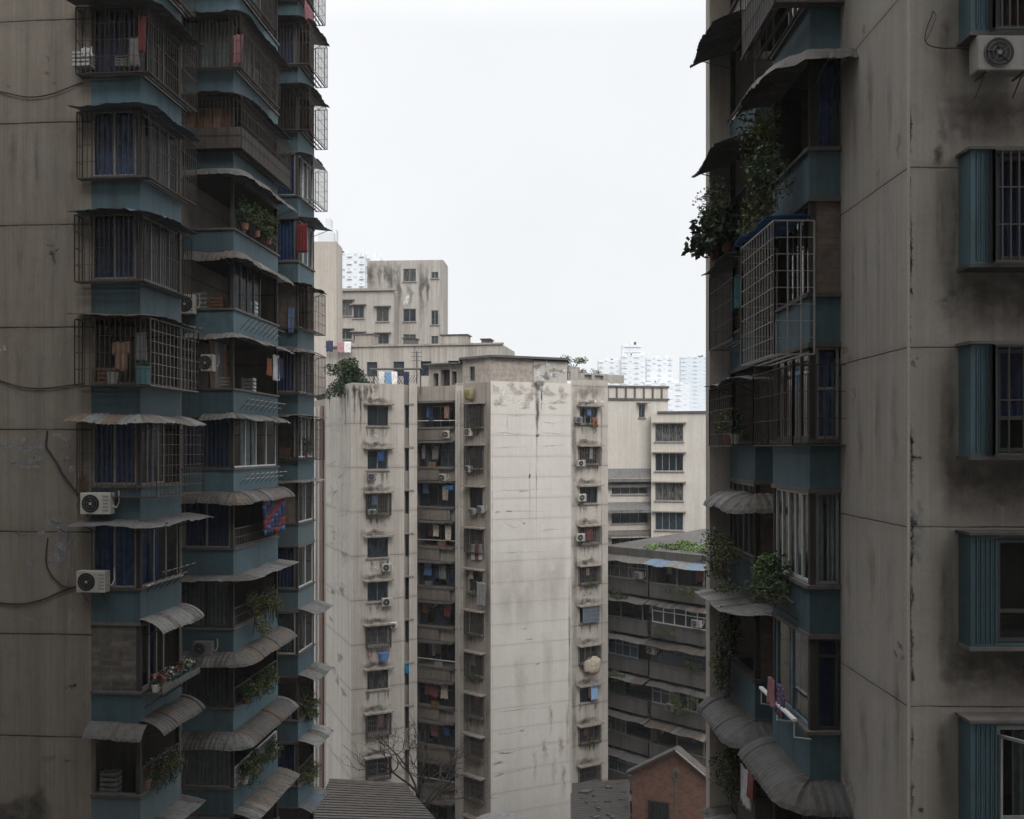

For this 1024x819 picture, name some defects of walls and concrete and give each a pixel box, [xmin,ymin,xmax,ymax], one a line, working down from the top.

damp [369,270,429,304]